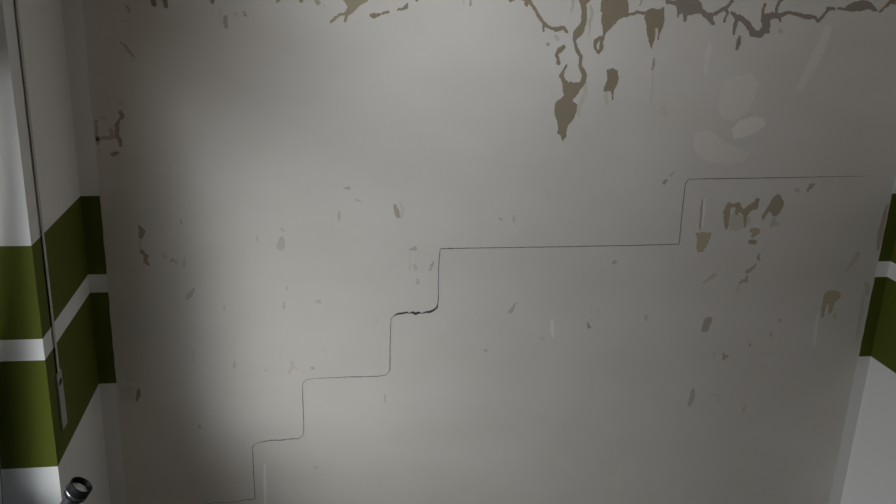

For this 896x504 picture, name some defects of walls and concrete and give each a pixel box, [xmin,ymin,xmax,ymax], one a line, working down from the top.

peeling [330,0,368,23]
peeling [370,0,418,19]
peeling [509,0,896,141]
crack [491,178,749,248]
crack [390,248,466,339]
crack [209,366,390,504]